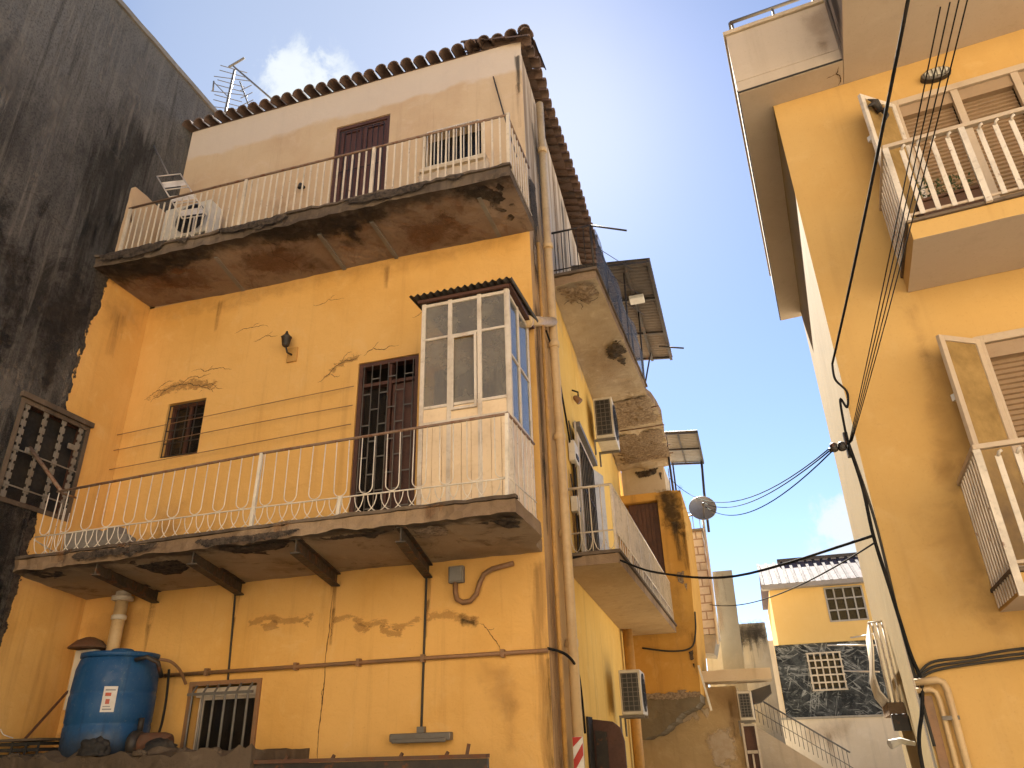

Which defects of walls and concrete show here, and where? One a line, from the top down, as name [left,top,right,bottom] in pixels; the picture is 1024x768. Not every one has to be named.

leakage [0,58,152,414]
leakage [262,208,387,244]
leakage [101,249,212,285]
spalling [557,283,599,304]
crack [322,345,398,380]
spalling [606,340,627,366]
crack [150,367,225,400]
spalling [614,395,671,480]
spalling [72,543,190,575]
spalling [195,528,299,555]
leakage [657,491,686,556]
crack [317,596,333,758]